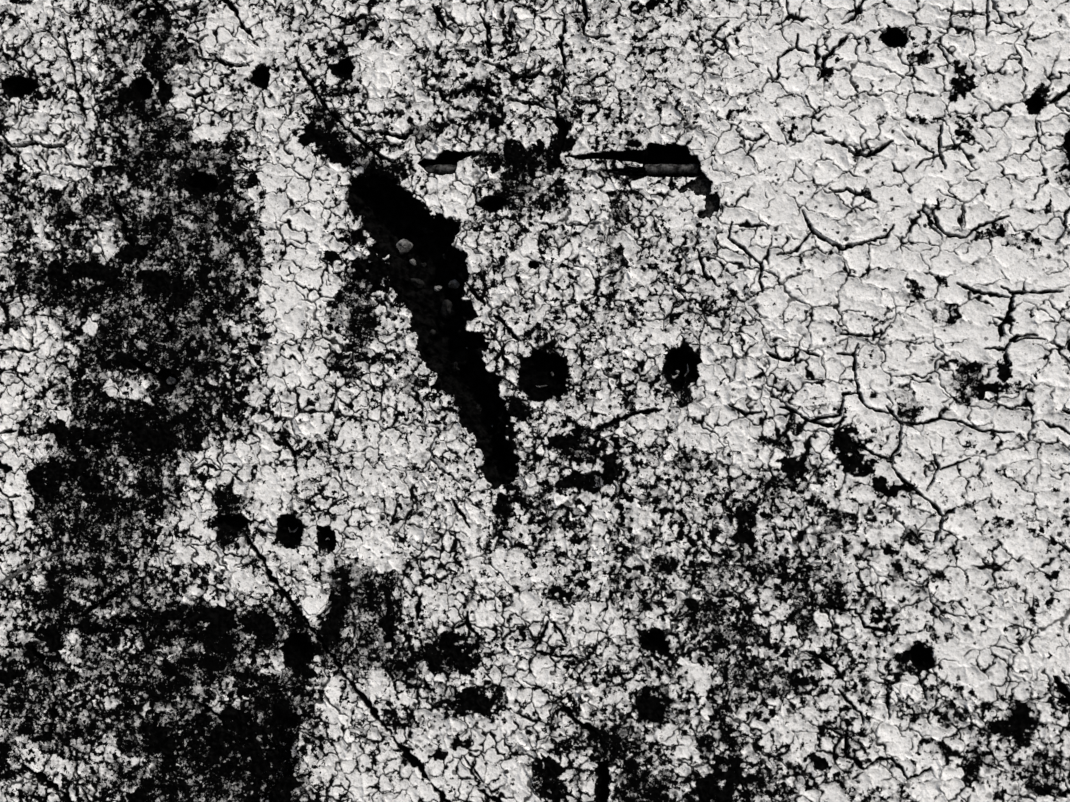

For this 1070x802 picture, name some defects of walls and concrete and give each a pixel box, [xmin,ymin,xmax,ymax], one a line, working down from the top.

crack [439,0,609,155]
spalling [570,144,719,219]
water stain [45,240,194,312]
spalling [347,176,519,488]
spalling [519,351,568,401]
spalling [663,346,699,389]
crack [956,284,1067,365]
water stain [25,407,179,504]
crack [729,333,1006,541]
water stain [145,600,288,640]
crack [246,534,451,802]
water stain [140,693,306,802]